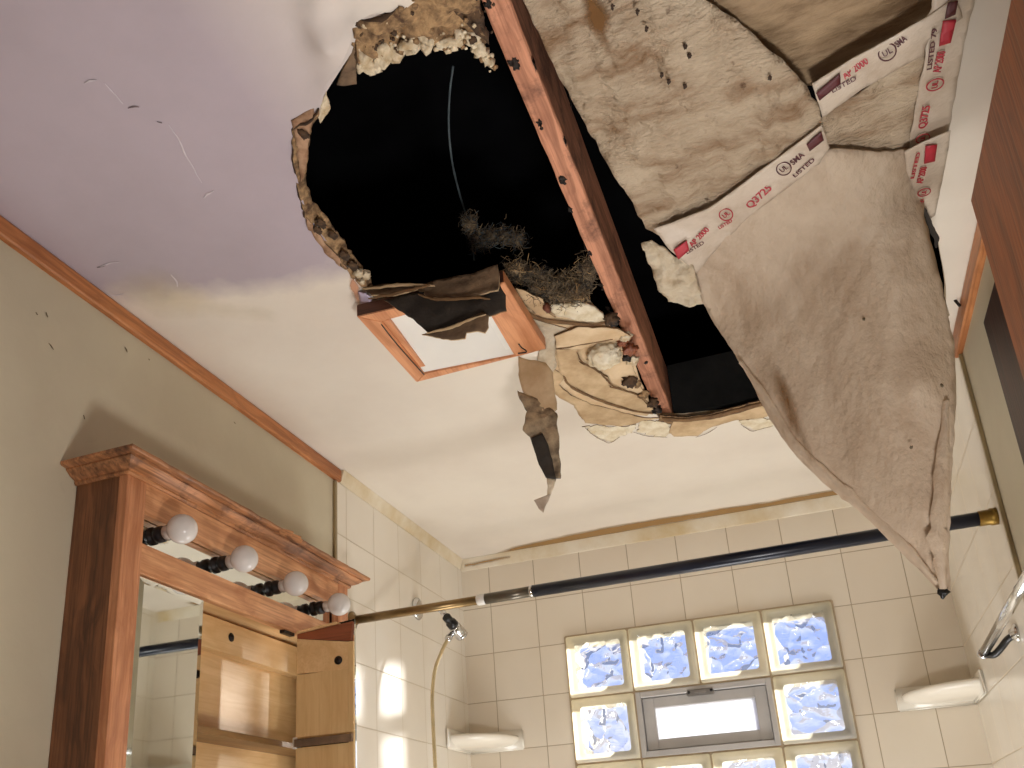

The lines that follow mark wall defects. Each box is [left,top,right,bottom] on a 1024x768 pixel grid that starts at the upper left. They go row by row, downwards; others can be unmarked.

spalling [337,0,498,86]
crack [84,80,214,199]
spalling [291,92,373,304]
spalling [582,400,773,443]